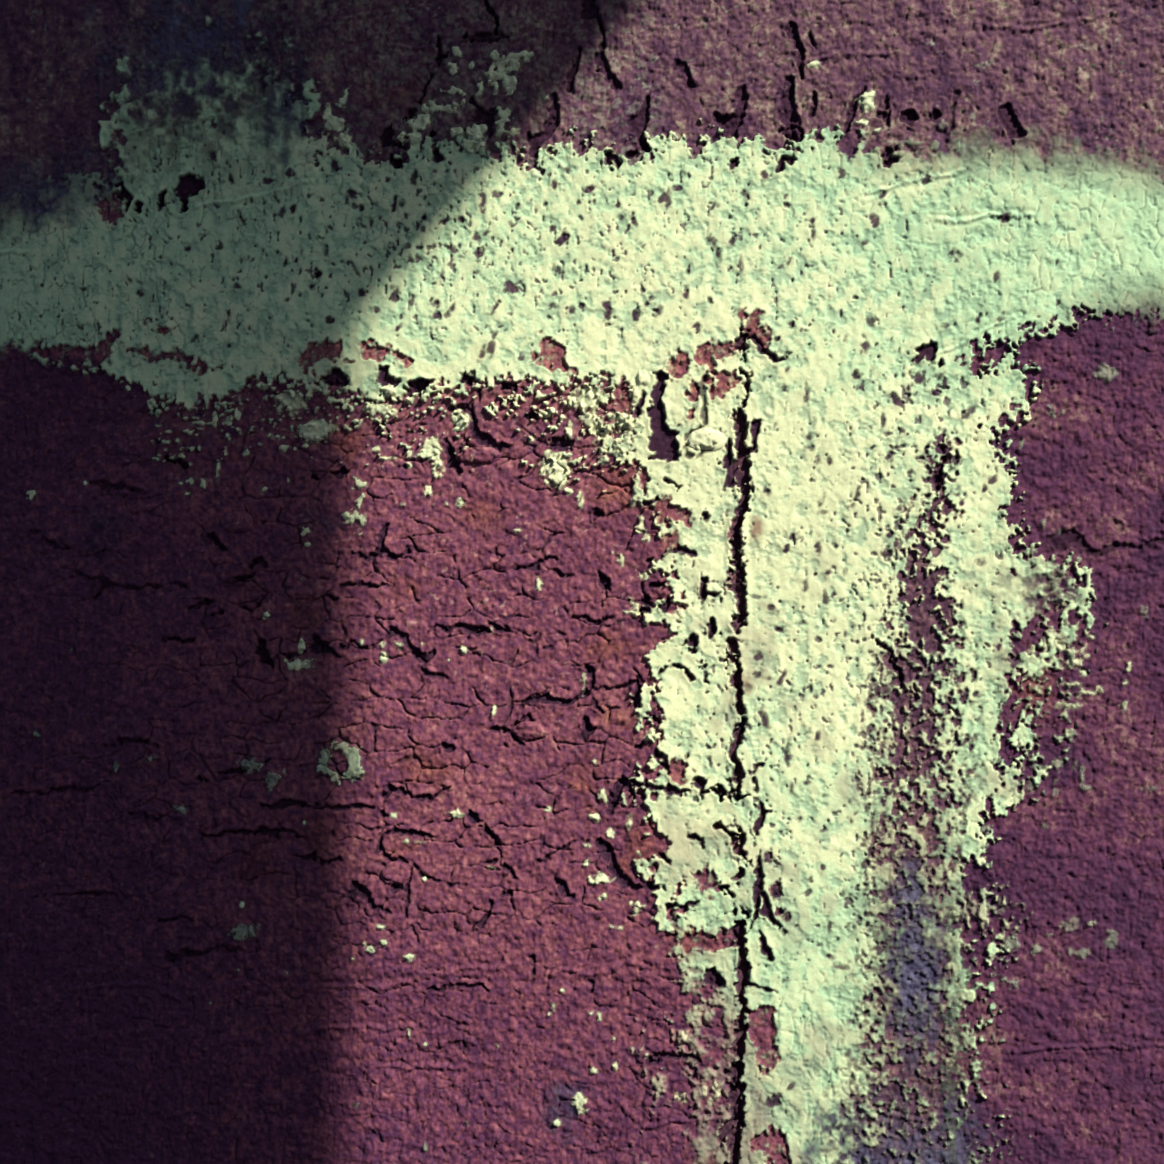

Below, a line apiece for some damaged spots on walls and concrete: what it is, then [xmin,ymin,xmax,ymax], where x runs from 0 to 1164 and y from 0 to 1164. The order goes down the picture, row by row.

peeling [0,0,1164,228]
peeling [256,316,431,452]
corrosion [598,467,632,501]
spalling [518,322,741,521]
corrosion [405,754,448,780]
crack [339,615,639,679]
crack [491,664,695,746]
spalling [682,618,717,683]
peeling [817,302,1164,1164]
crack [202,784,455,918]
crack [467,750,699,932]
crack [741,763,786,992]